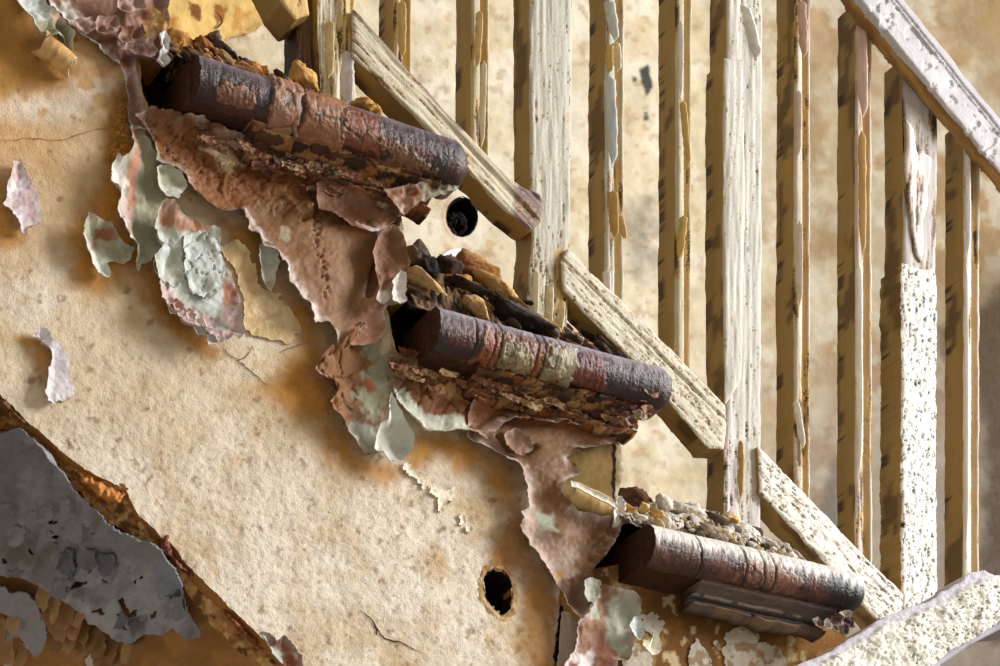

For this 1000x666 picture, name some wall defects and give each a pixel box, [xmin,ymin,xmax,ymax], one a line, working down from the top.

peeling [0,0,665,666]
crack [360,610,417,651]
peeling [688,626,787,666]
peeling [811,610,855,635]